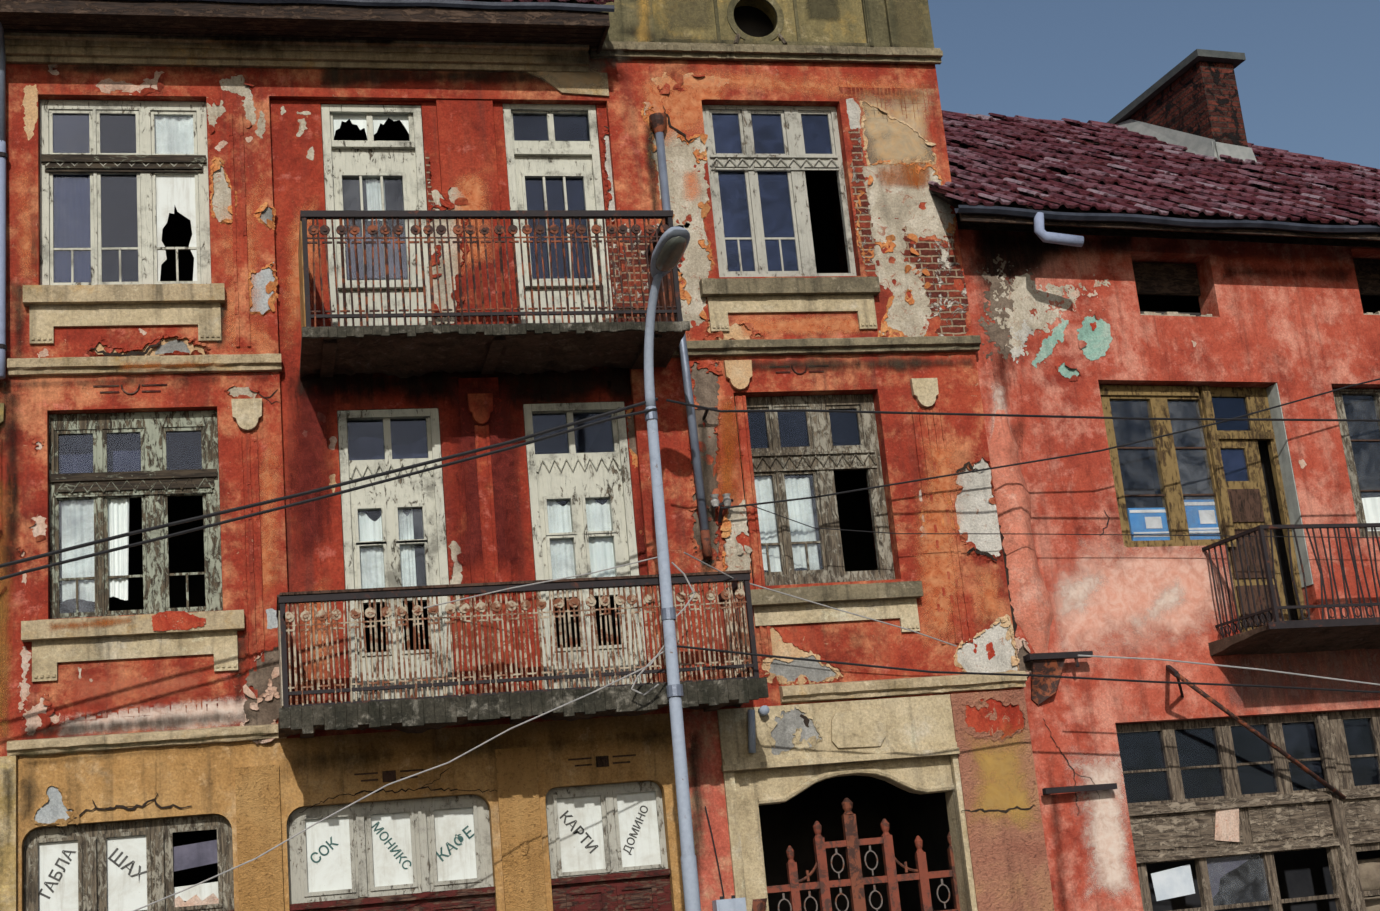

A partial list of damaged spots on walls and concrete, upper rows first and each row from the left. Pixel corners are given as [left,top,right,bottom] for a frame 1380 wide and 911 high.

flaking render [207,72,317,334]
peeling [599,71,1113,381]
peeling [626,408,638,468]
peeling [687,359,752,572]
leakage [0,393,16,726]
flaking render [919,449,1032,677]
flaking render [758,626,844,686]
flaking render [31,783,80,826]
crack [74,792,192,819]
peeling [765,705,823,755]
peeling [961,694,1029,821]